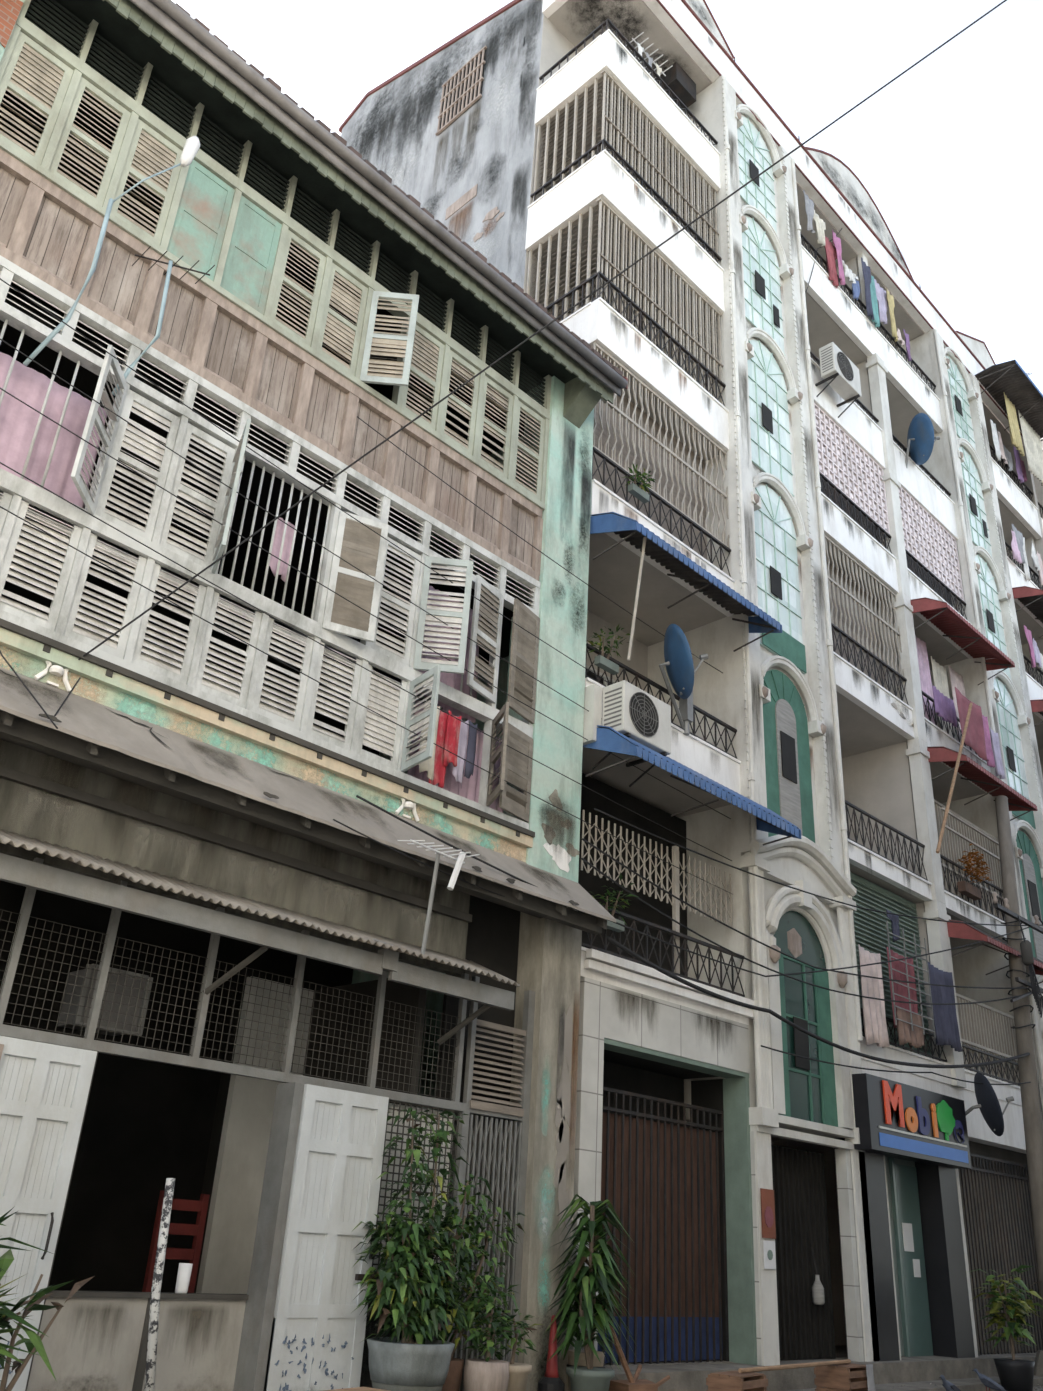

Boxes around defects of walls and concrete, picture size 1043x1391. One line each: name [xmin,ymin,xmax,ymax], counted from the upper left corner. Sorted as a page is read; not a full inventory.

spalling [0,0,23,49]
water stain [485,0,541,65]
water stain [575,0,674,70]
water stain [354,42,466,184]
water stain [521,64,533,113]
water stain [513,174,526,215]
water stain [566,433,603,541]
peeling [118,696,275,768]
peeling [302,766,350,795]
peeling [386,798,453,835]
peeling [541,789,580,872]
peeling [275,1334,354,1391]